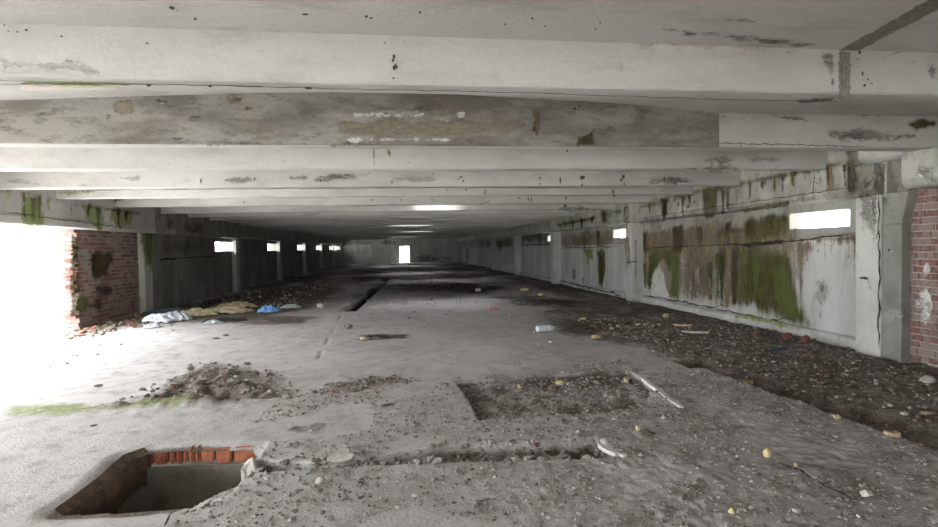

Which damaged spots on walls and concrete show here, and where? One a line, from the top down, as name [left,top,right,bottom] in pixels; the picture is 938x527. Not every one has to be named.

leakage [829,119,930,141]
leakage [22,194,51,220]
leakage [640,174,814,323]
crack [874,193,882,349]
efflorescence [916,287,932,324]